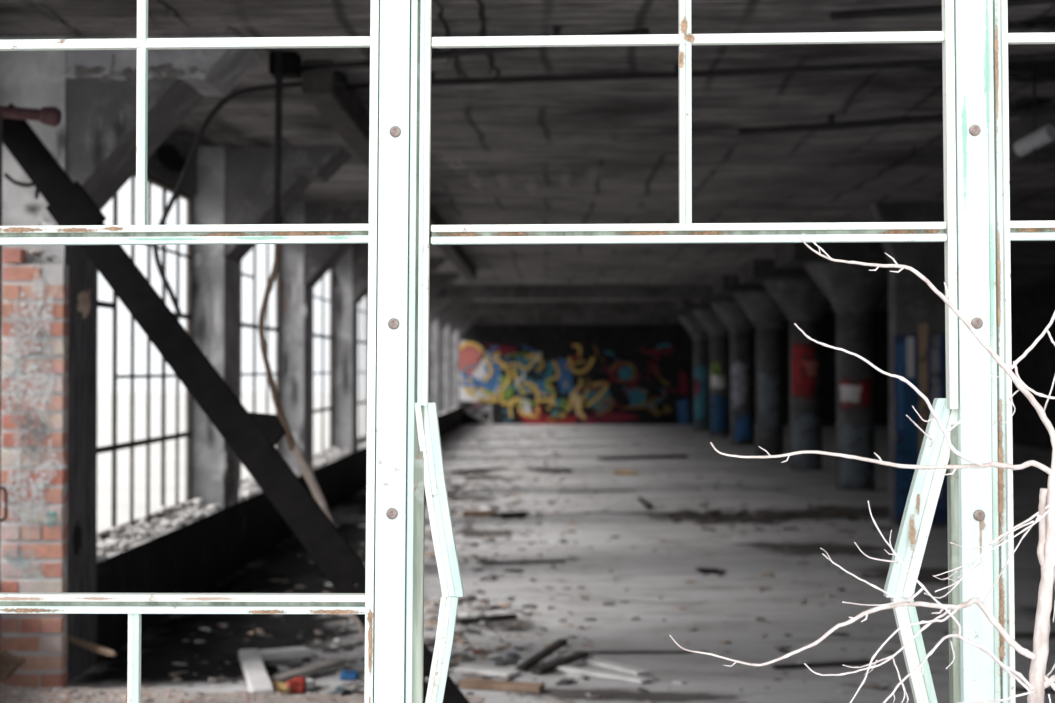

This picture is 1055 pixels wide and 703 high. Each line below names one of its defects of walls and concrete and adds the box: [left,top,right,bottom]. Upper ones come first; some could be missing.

crack [434,0,460,78]
crack [476,0,501,77]
rust [679,17,695,68]
peeling [3,249,64,528]
rust [909,494,920,550]
rust [310,609,373,672]